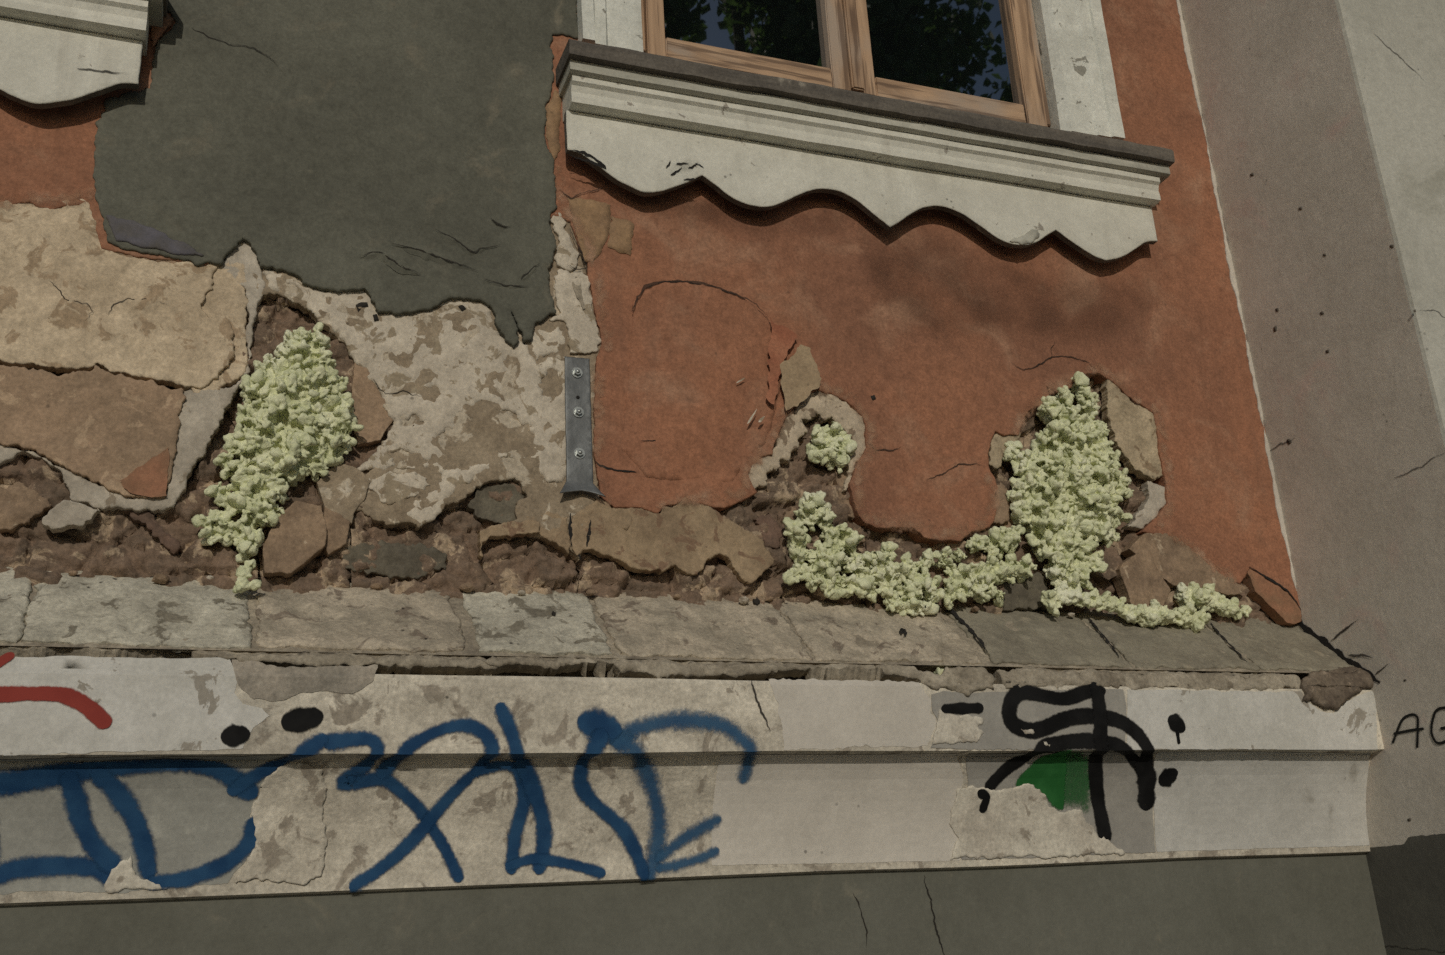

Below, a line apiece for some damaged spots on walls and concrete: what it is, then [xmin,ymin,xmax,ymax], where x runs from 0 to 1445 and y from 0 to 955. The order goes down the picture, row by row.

peeling [0,191,1302,628]
spalling [232,660,378,702]
crack [1297,619,1388,684]
peeling [949,783,1125,860]